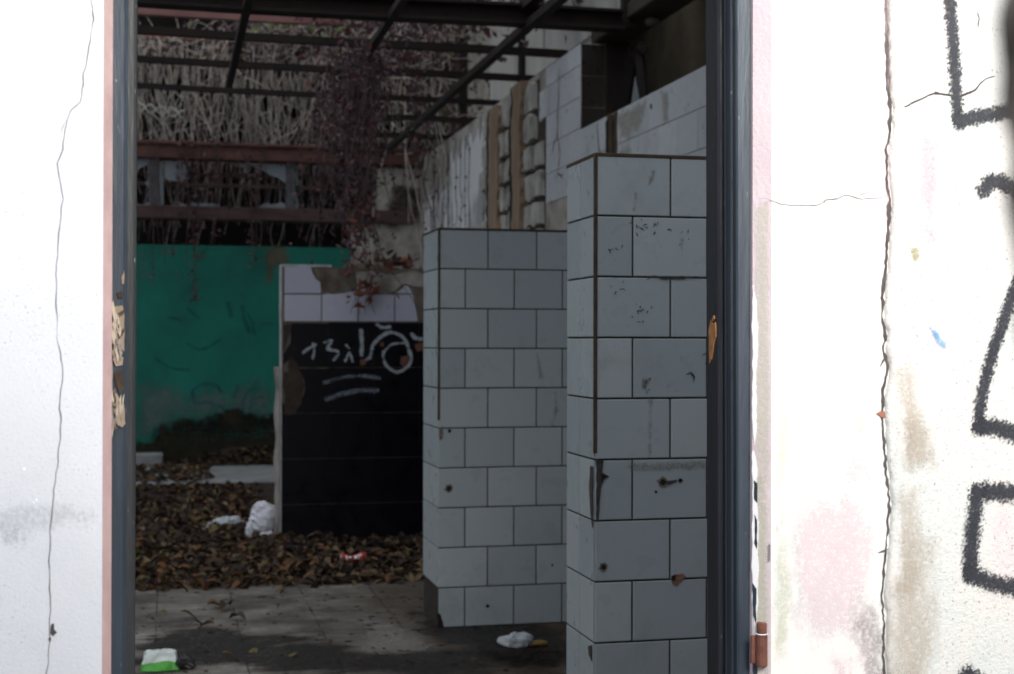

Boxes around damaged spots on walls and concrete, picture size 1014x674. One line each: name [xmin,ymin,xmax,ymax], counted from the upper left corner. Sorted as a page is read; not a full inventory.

crack [46,0,94,674]
peeling [112,270,126,436]
spalling [283,325,304,415]
spalling [313,267,340,293]
spalling [356,263,424,321]
crack [762,0,994,674]